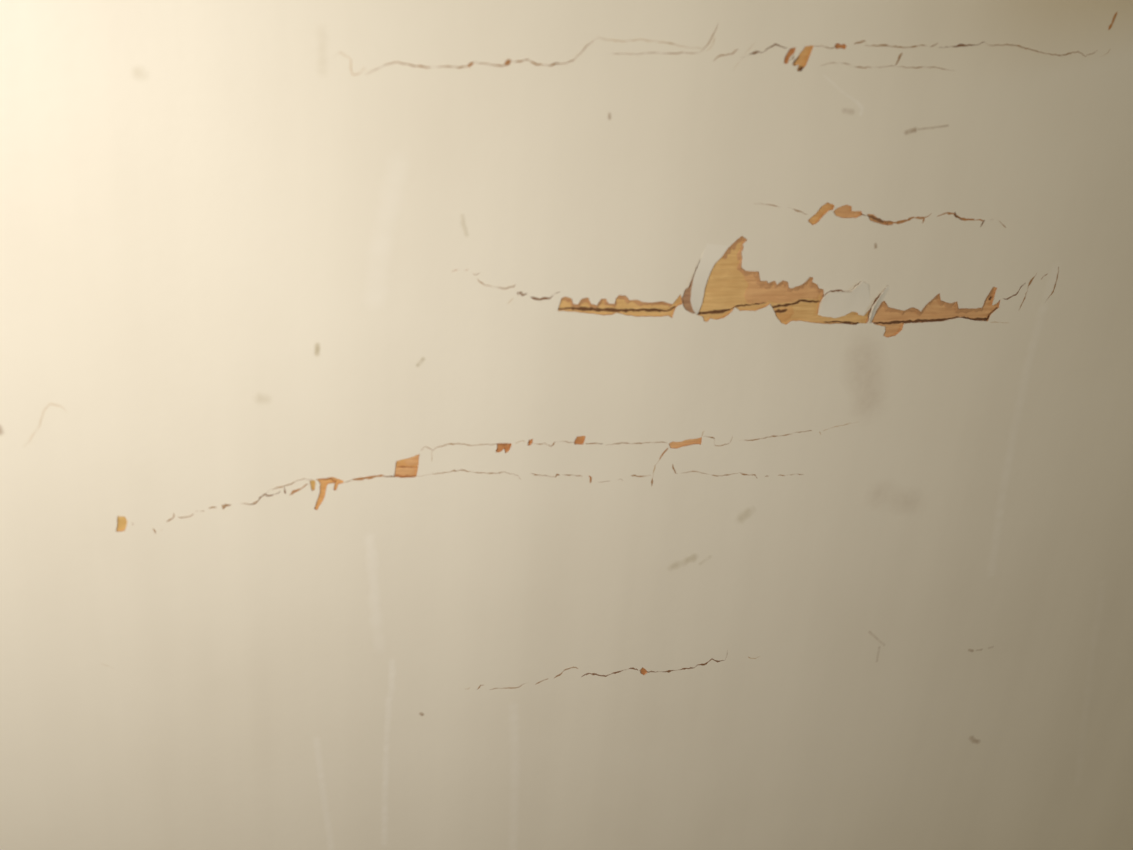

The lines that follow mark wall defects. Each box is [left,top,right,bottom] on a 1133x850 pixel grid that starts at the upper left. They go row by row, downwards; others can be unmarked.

crack [334,25,1111,76]
peeling [452,236,1059,337]
crack [468,656,756,690]